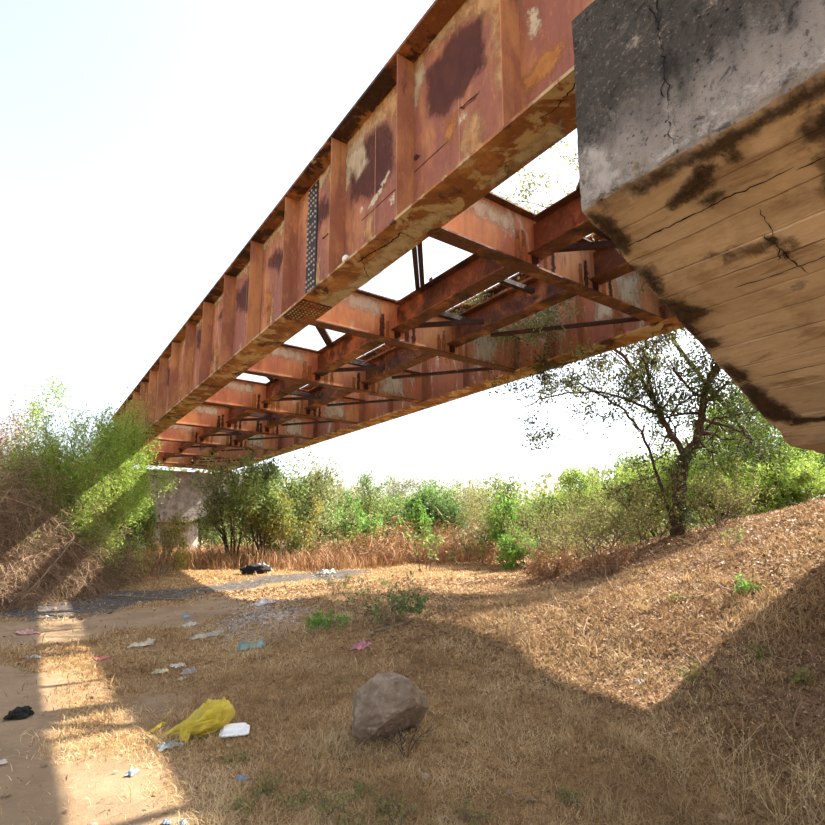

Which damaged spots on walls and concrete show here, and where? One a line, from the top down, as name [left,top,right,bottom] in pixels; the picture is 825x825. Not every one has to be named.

peeling [527,7,541,39]
rust [417,0,502,142]
crack [649,0,674,149]
rust [345,89,397,199]
leakage [582,147,621,198]
leakage [630,49,825,210]
crack [630,157,825,246]
rust [237,263,250,311]
rust [263,221,284,271]
leakage [631,265,721,350]
crack [734,210,825,289]
leakage [723,364,825,426]